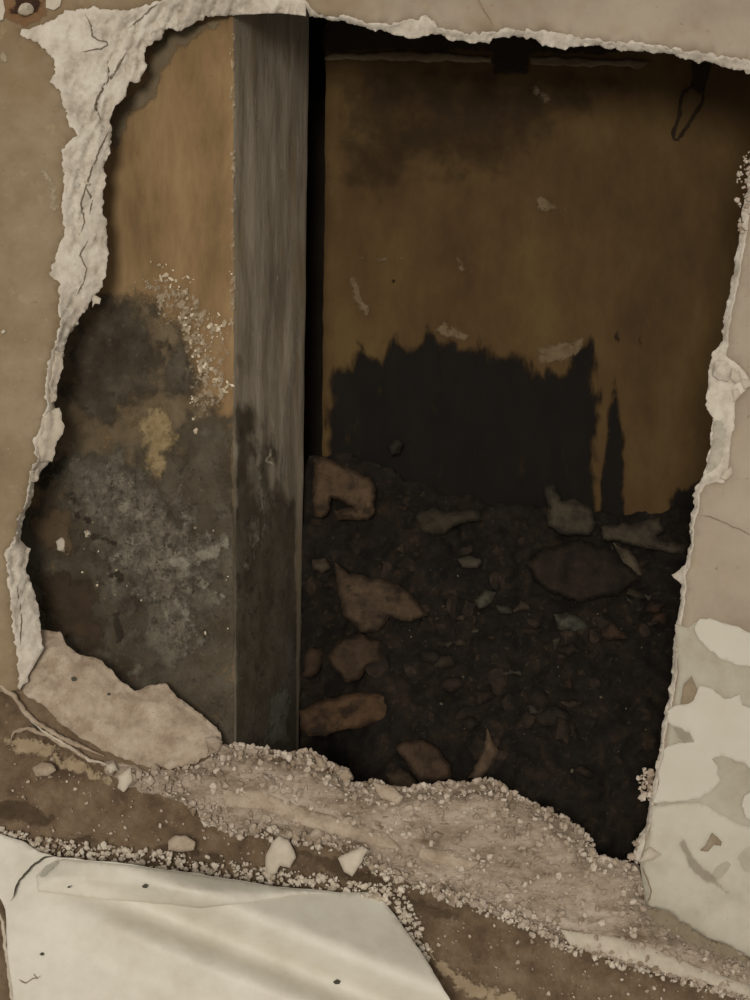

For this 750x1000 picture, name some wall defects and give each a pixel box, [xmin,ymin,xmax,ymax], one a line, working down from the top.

water stain [322,18,618,74]
crack [77,14,127,294]
water stain [20,260,297,752]
spalling [4,0,750,770]
water stain [325,333,624,515]
water stain [670,483,698,509]
flaking render [33,762,56,776]